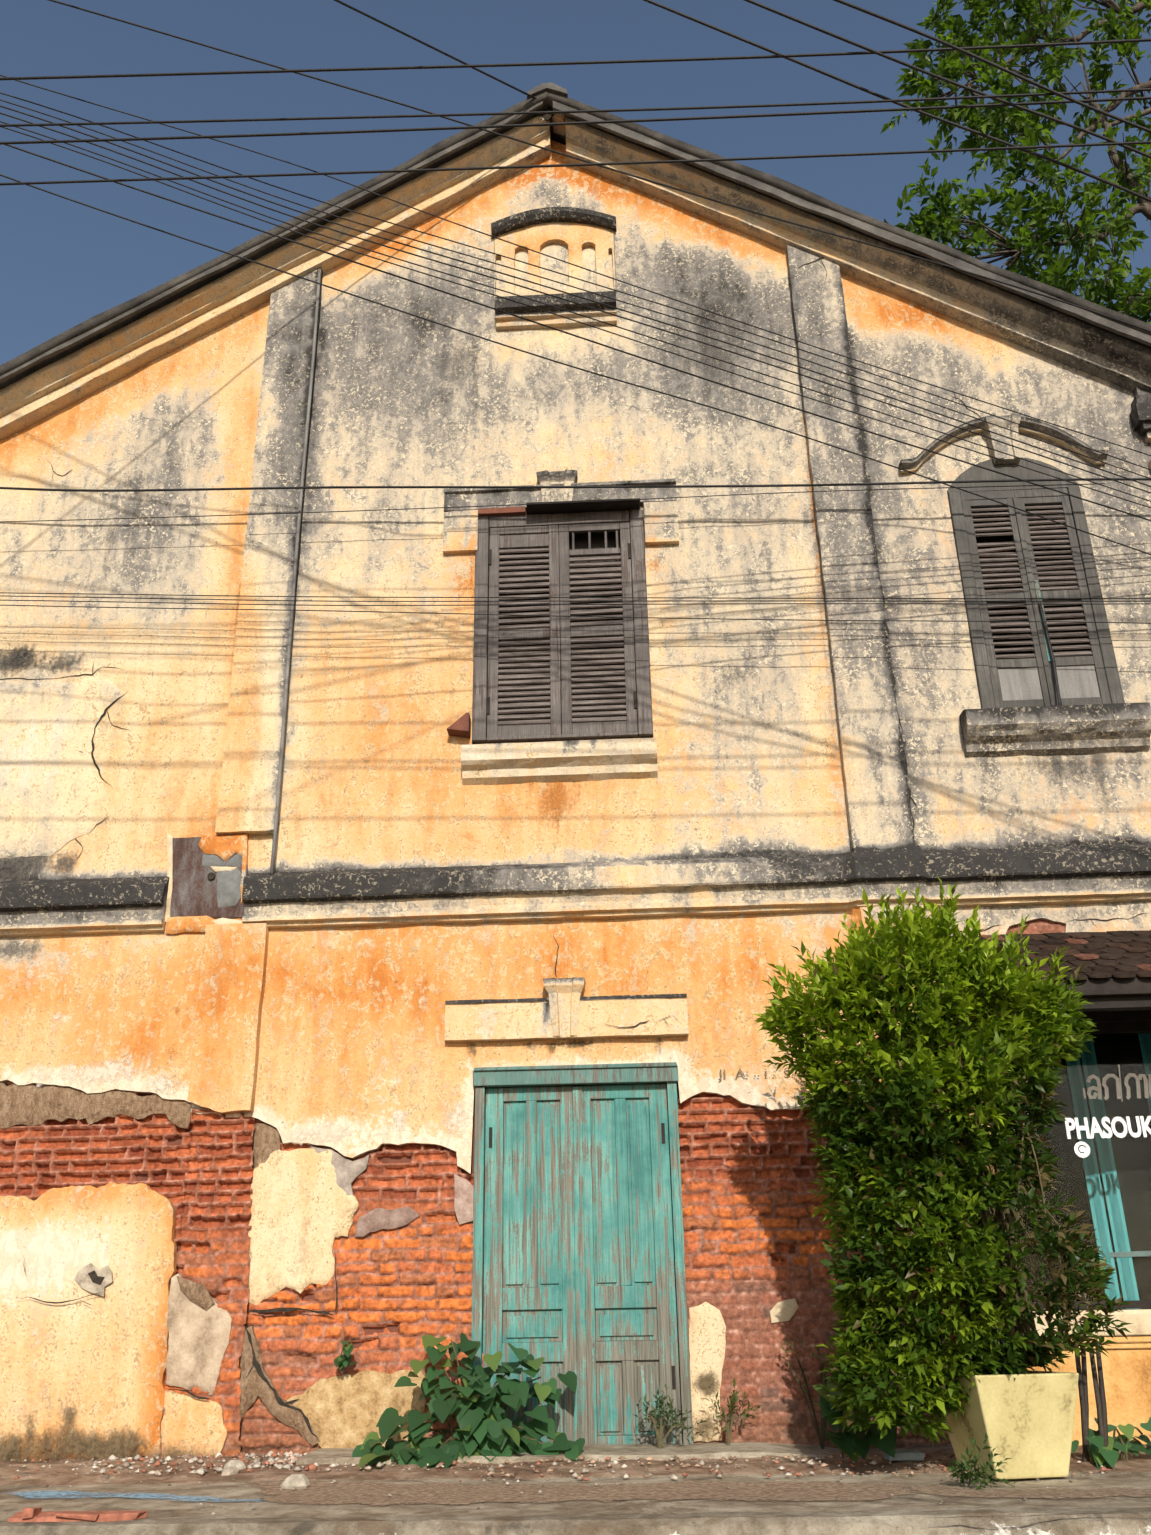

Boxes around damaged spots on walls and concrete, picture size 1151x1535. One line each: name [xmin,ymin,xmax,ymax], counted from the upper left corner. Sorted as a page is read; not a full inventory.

damp [0,646,80,676]
crack [0,662,132,857]
damp [1040,752,1105,785]
damp [749,850,830,858]
spalling [0,1081,484,1458]
spalling [677,1093,926,1448]
spalling [895,1413,951,1448]